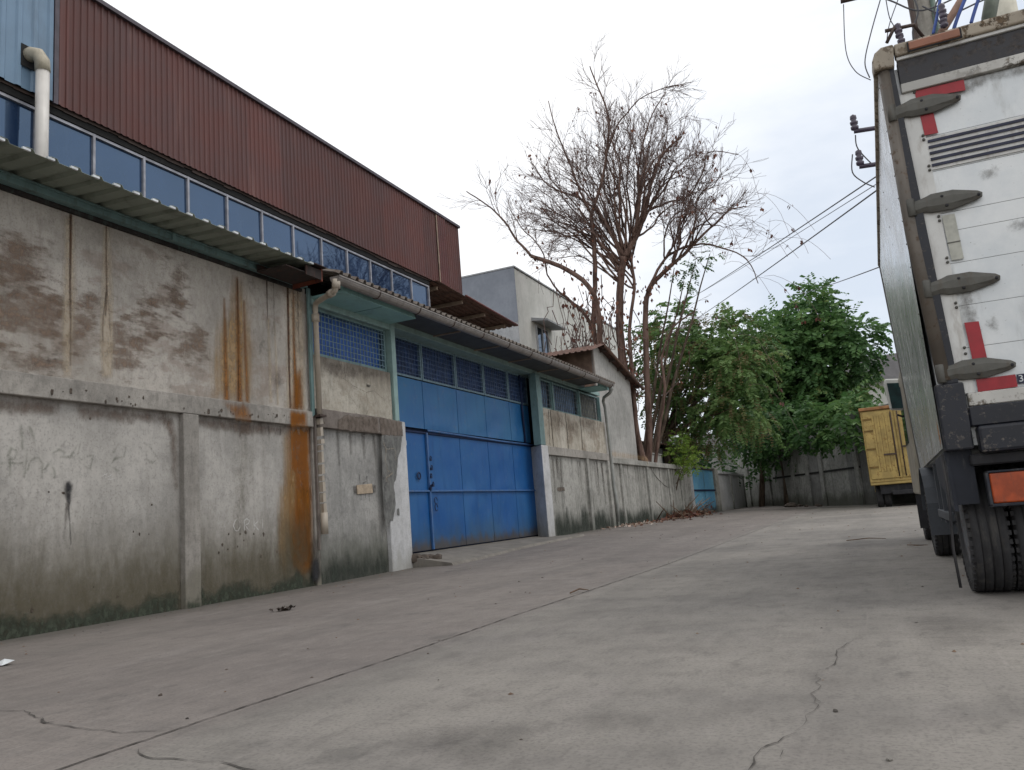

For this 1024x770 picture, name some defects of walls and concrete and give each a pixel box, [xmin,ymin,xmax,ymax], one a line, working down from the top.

rust [216,288,249,433]
rust [282,288,312,572]